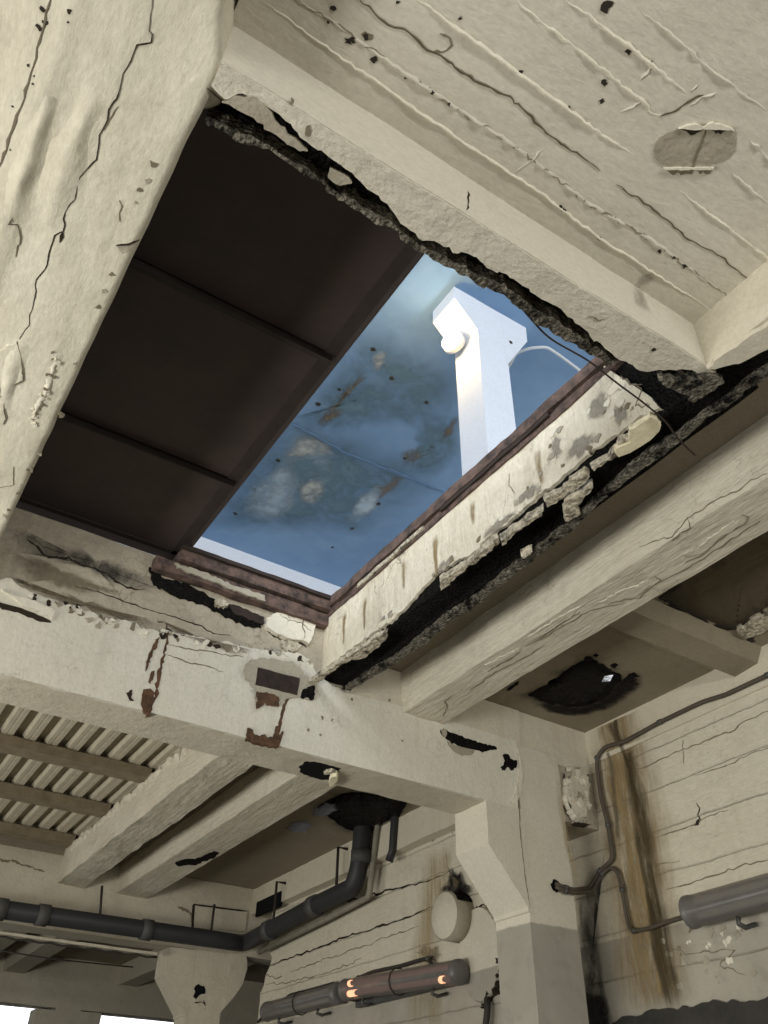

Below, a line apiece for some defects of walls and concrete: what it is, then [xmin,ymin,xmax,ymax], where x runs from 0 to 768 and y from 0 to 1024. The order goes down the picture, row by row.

crack [0,0,72,165]
crack [19,9,153,339]
peeling [222,94,311,152]
crack [360,0,747,295]
damp [29,547,131,619]
rust [126,623,169,718]
spalling [0,588,316,749]
spalling [149,567,264,628]
spalling [345,310,768,701]
crack [634,711,768,776]
damp [601,715,677,1000]
damp [580,888,608,1024]